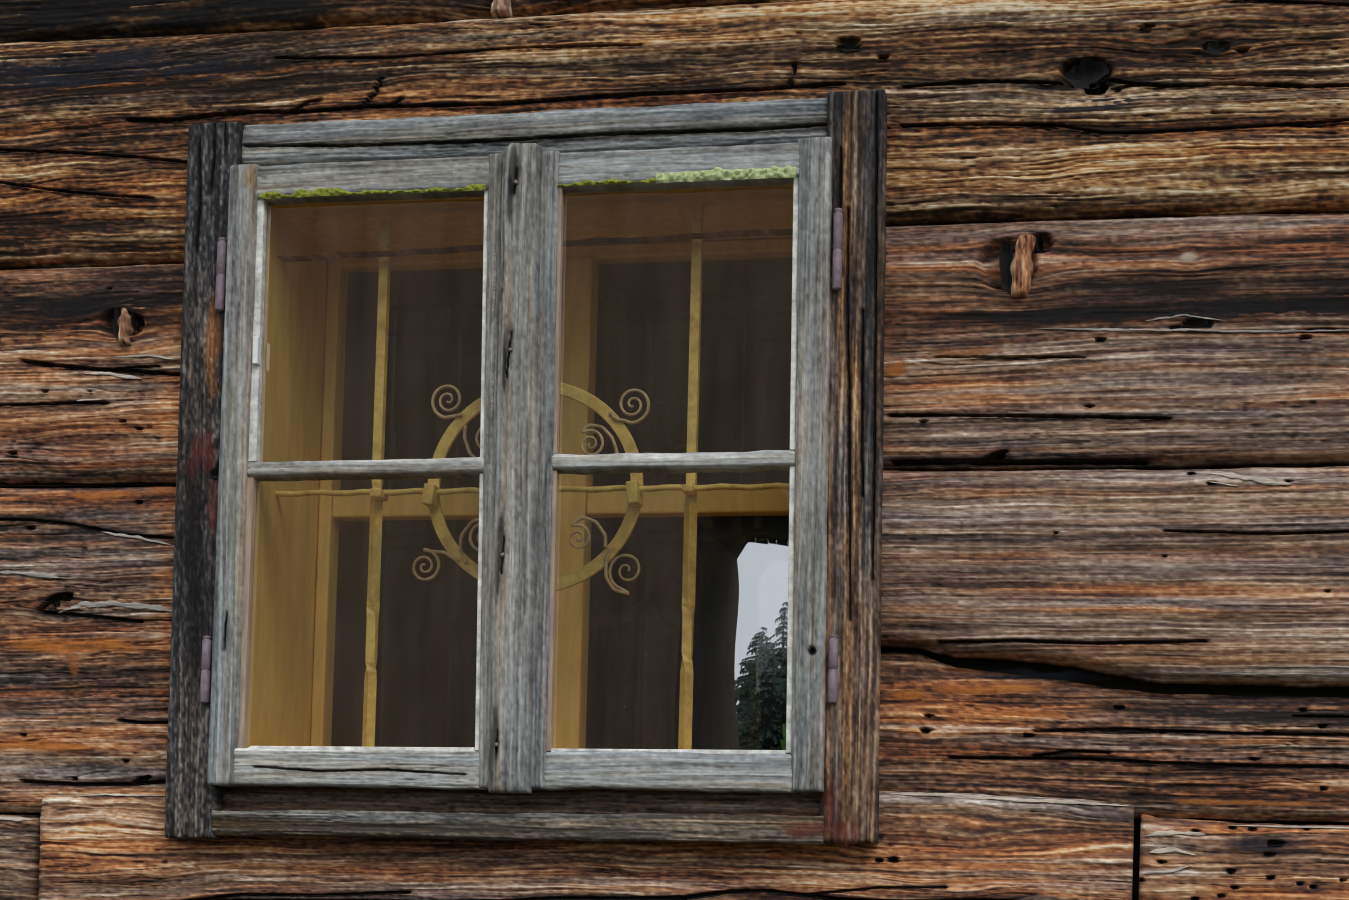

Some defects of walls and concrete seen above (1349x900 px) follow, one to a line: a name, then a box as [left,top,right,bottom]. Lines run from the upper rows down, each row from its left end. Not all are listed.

crack [71,56,1150,615]
crack [40,596,138,623]
crack [202,891,409,900]
crack [526,887,979,900]